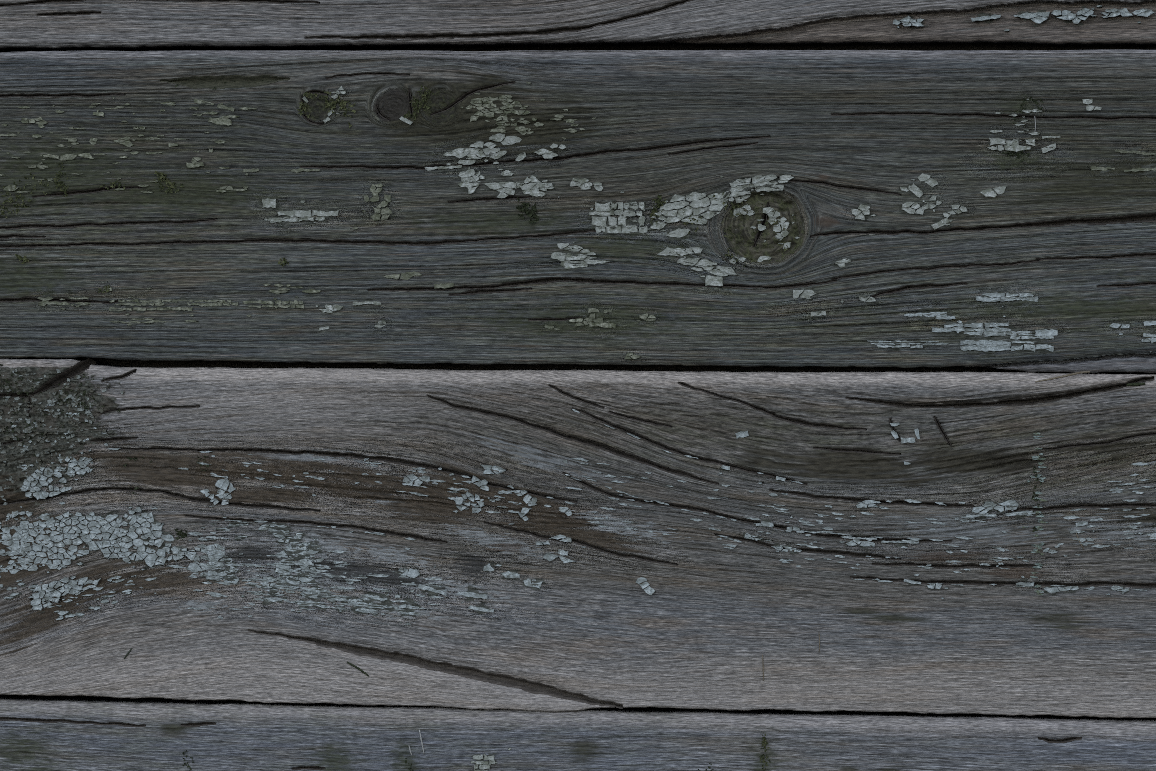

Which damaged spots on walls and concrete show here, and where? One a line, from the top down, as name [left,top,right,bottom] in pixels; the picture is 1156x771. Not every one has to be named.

spalling [658,0,1156,44]
peeling [424,93,596,199]
peeling [988,98,1060,153]
peeling [551,242,609,269]
peeling [570,171,800,292]
peeling [851,203,877,221]
peeling [899,173,969,230]
crack [0,358,1156,588]
peeling [0,403,1156,625]
crack [248,629,623,709]
peeling [469,748,511,771]